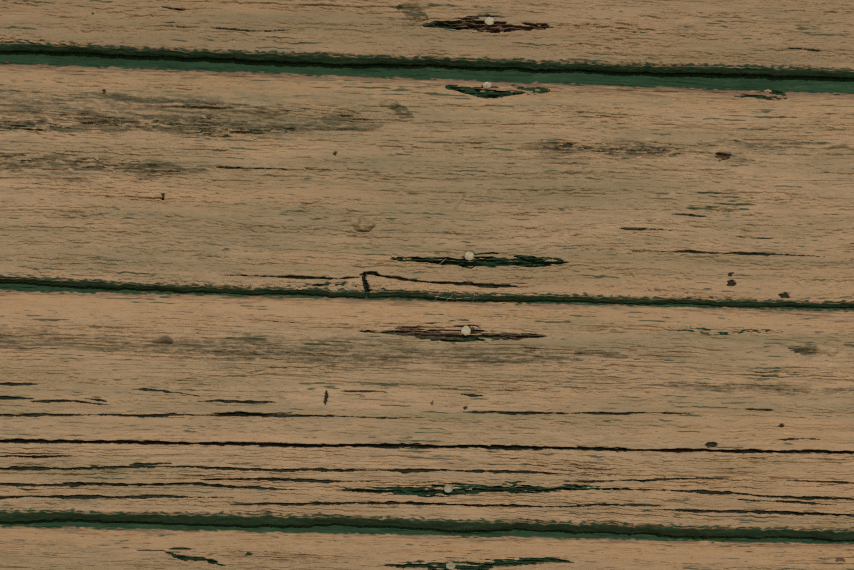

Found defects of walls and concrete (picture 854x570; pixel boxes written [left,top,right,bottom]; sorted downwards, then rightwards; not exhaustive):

crack [225,271,522,292]
crack [0,382,423,419]
crack [461,394,690,415]
crack [779,435,820,443]
crack [0,455,854,517]